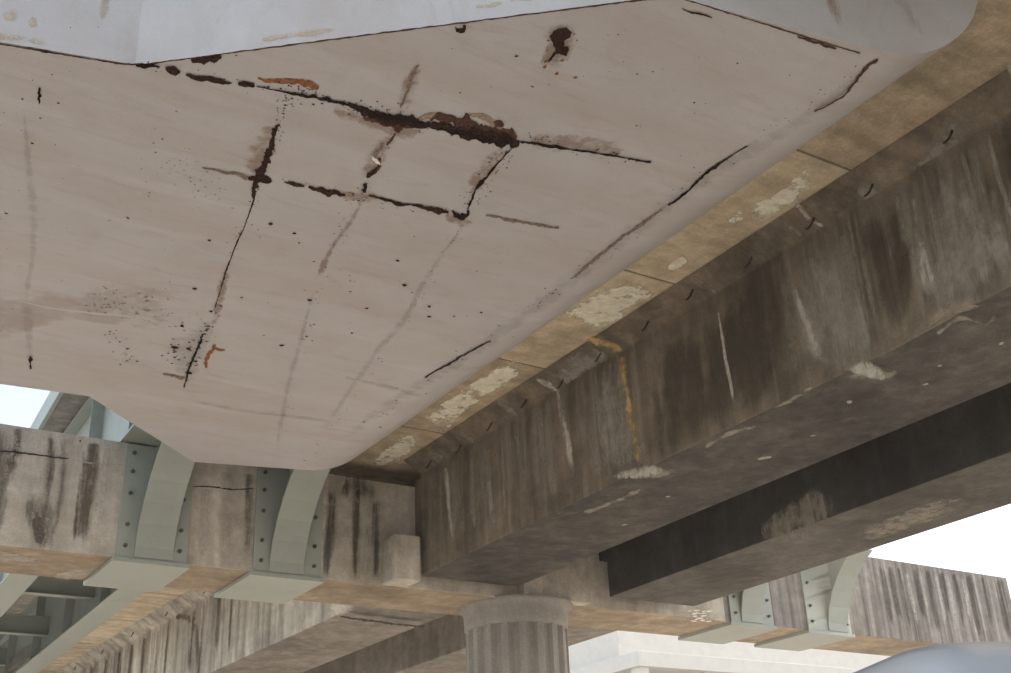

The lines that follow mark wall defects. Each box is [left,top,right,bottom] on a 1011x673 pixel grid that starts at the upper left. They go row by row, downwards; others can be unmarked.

rust [0,0,646,85]
rust [685,0,860,54]
crack [814,59,878,112]
crack [136,64,651,307]
crack [573,146,748,278]
damp [867,155,1010,307]
rust [161,188,259,388]
peeling [566,284,653,328]
damp [795,239,884,380]
peeling [426,360,519,430]
damp [74,443,99,534]
peeling [374,436,416,466]